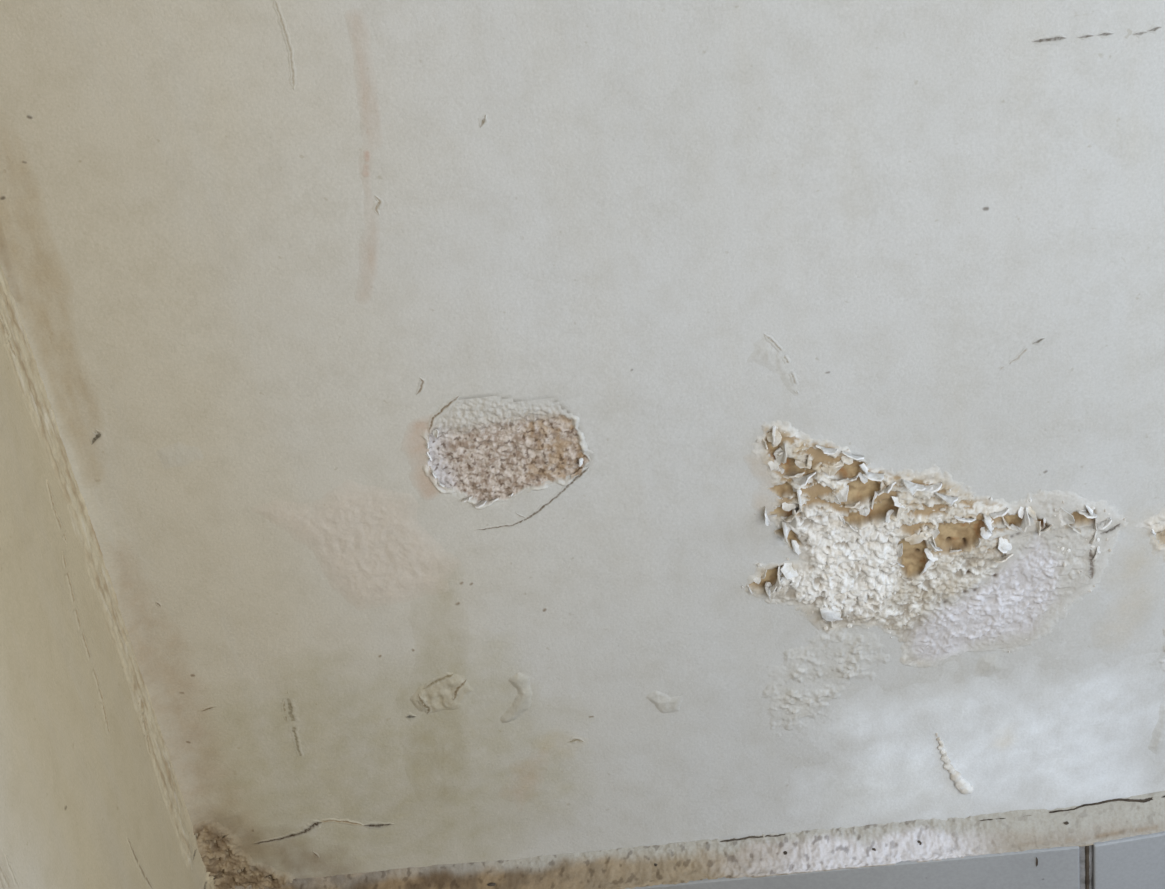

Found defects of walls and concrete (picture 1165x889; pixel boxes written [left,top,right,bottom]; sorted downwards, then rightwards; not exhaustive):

spalling [419,396,594,510]
crack [474,467,589,531]
spalling [742,420,1165,668]
spalling [405,672,474,722]
crack [253,818,395,858]